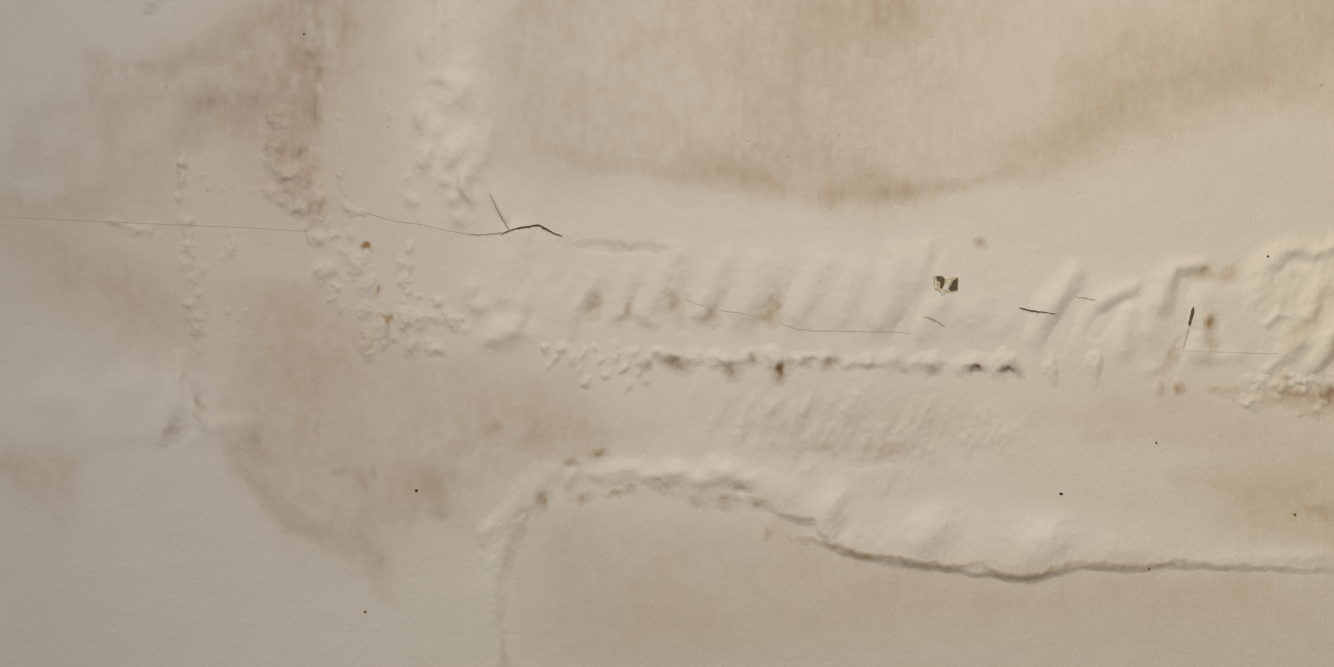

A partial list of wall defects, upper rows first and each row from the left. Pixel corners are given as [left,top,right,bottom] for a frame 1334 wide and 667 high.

damp [502,0,1334,233]
crack [361,195,563,237]
damp [0,0,680,611]
damp [631,348,698,379]
damp [660,284,725,332]
damp [747,274,793,332]
damp [690,349,946,426]
peeling [933,275,959,296]
damp [1199,310,1223,360]
damp [1182,260,1244,287]
damp [1015,340,1334,544]
damp [493,476,1334,667]